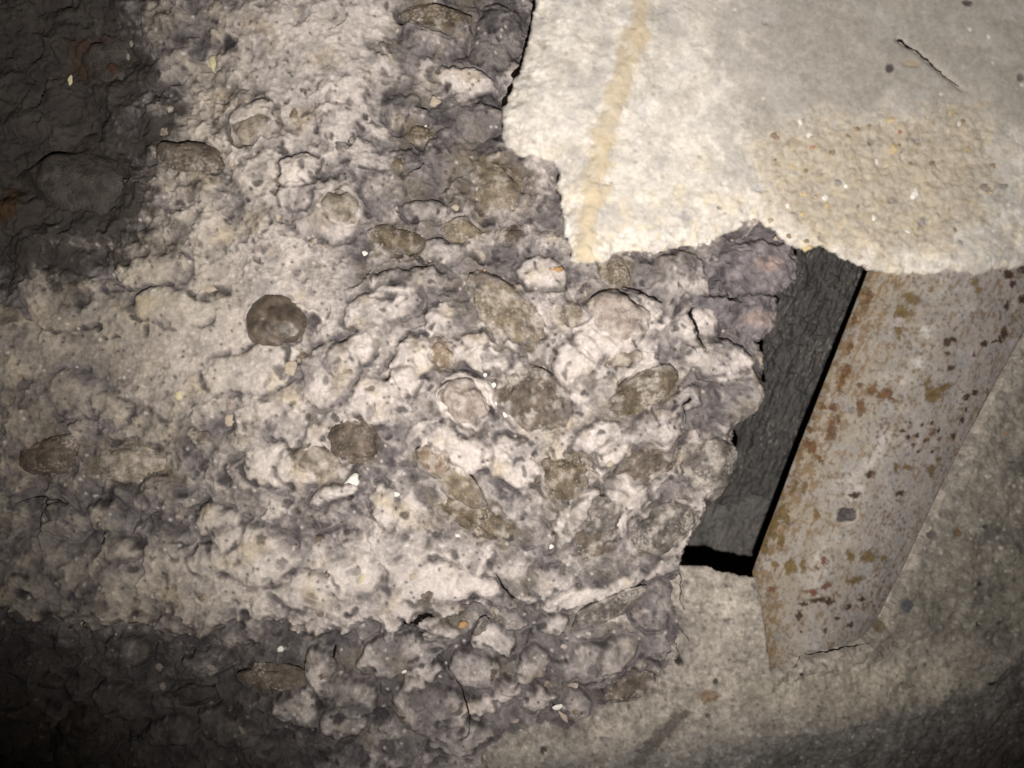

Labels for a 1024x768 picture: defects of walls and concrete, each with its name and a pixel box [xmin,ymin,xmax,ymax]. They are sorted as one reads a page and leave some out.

crack [897,39,961,89]
flaking render [875,117,935,200]
flaking render [781,179,863,226]
flaking render [773,233,813,252]
rust [894,293,920,339]
rust [1004,266,1024,310]
spalling [0,0,774,768]
rust [804,343,896,463]
rust [925,337,957,403]
rust [900,421,955,478]
rust [761,503,829,575]
rust [795,583,865,633]